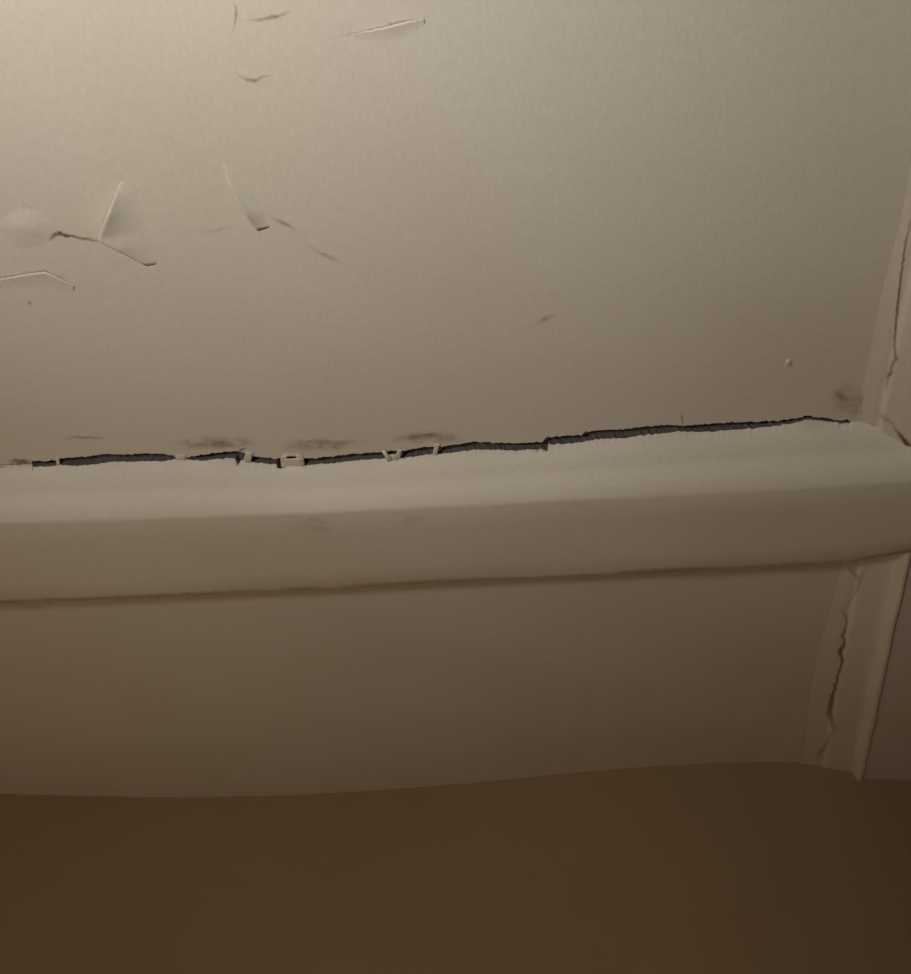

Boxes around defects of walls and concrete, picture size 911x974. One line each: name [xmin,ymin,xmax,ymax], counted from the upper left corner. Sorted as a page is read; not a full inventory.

crack [351,19,426,41]
peeling [96,182,157,266]
peeling [223,164,269,231]
crack [15,415,851,468]
crack [831,640,845,702]